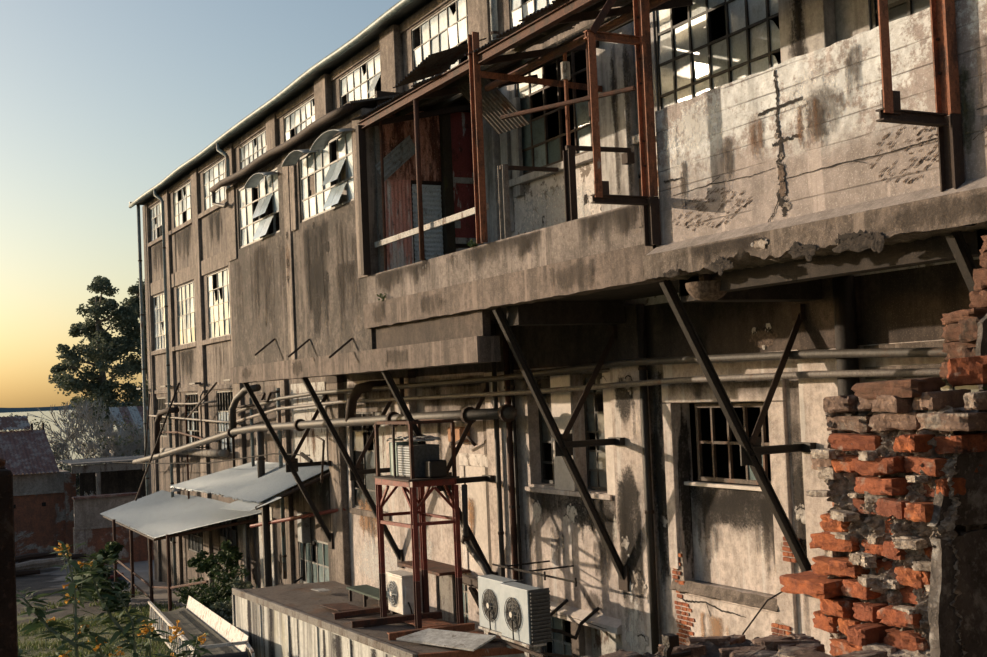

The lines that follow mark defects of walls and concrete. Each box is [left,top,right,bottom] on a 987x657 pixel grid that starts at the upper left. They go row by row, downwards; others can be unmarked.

leakage [789,0,807,57]
leakage [803,45,859,139]
crack [664,69,937,222]
leakage [303,222,360,332]
spalling [707,256,733,276]
spalling [751,237,768,249]
spalling [788,241,819,261]
spalling [832,230,884,254]
leakage [755,502,776,572]
spalling [672,547,695,645]